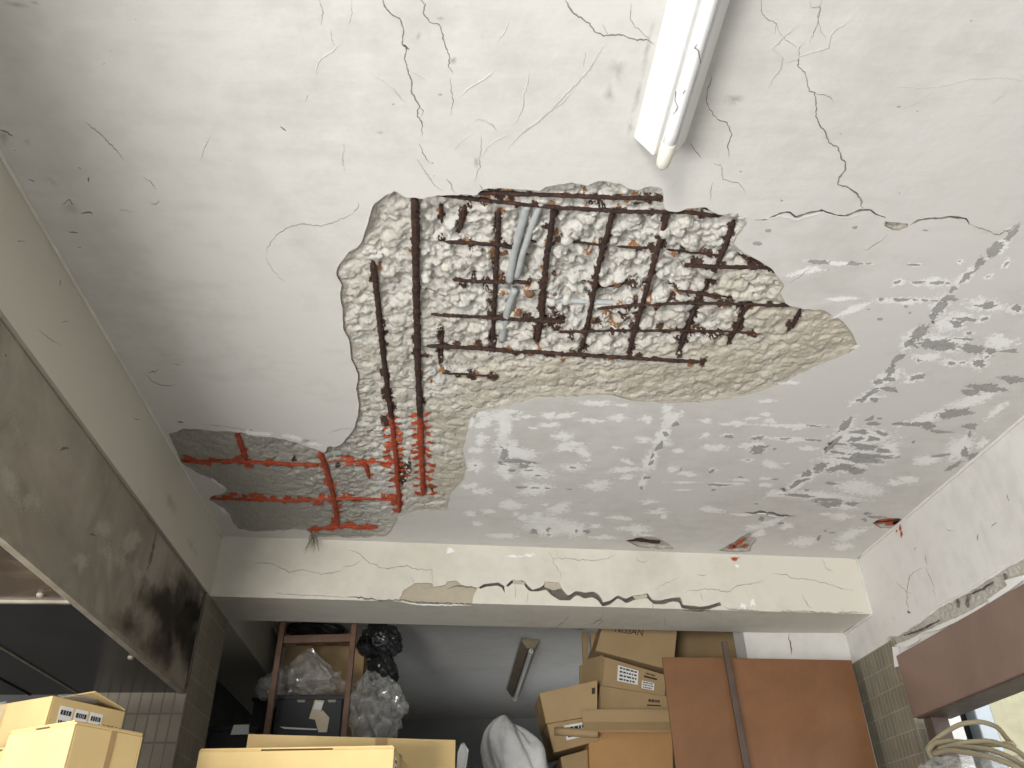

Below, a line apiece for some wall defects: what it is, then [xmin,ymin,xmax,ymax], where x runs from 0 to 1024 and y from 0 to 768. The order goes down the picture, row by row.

crack [383,0,483,193]
crack [566,1,653,44]
crack [692,77,745,200]
crack [758,1,907,248]
crack [956,216,1020,235]
spalling [170,181,1024,561]
damp [66,515,197,668]
crack [480,553,862,655]